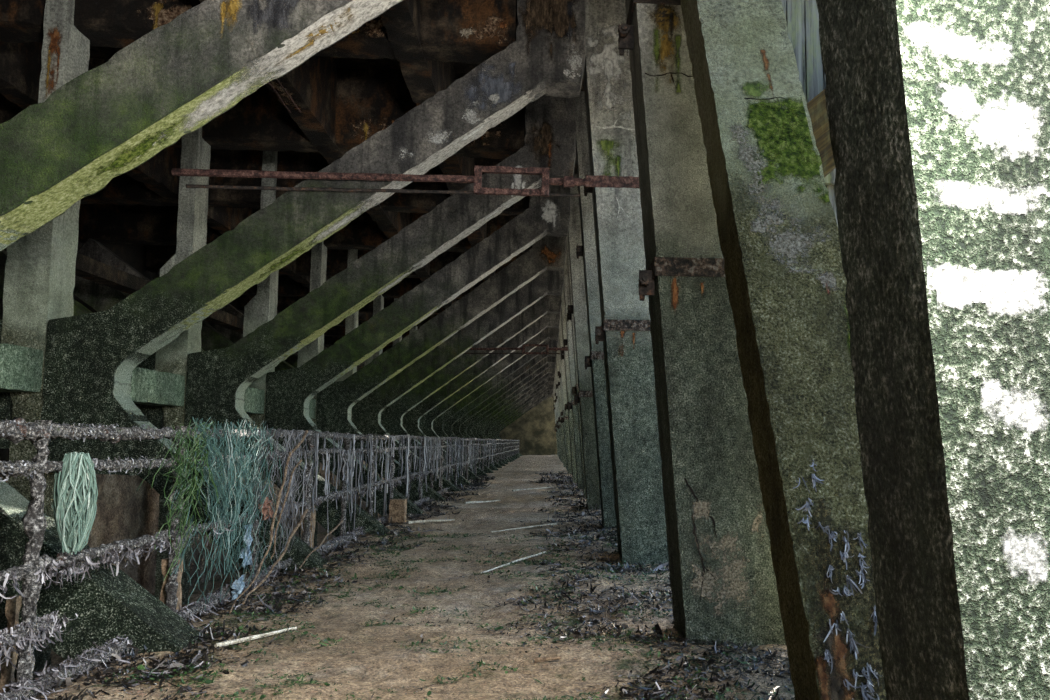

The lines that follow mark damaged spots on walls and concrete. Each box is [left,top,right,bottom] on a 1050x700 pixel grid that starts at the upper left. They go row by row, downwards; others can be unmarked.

crack [684,478,717,598]
corrosion [814,570,856,700]